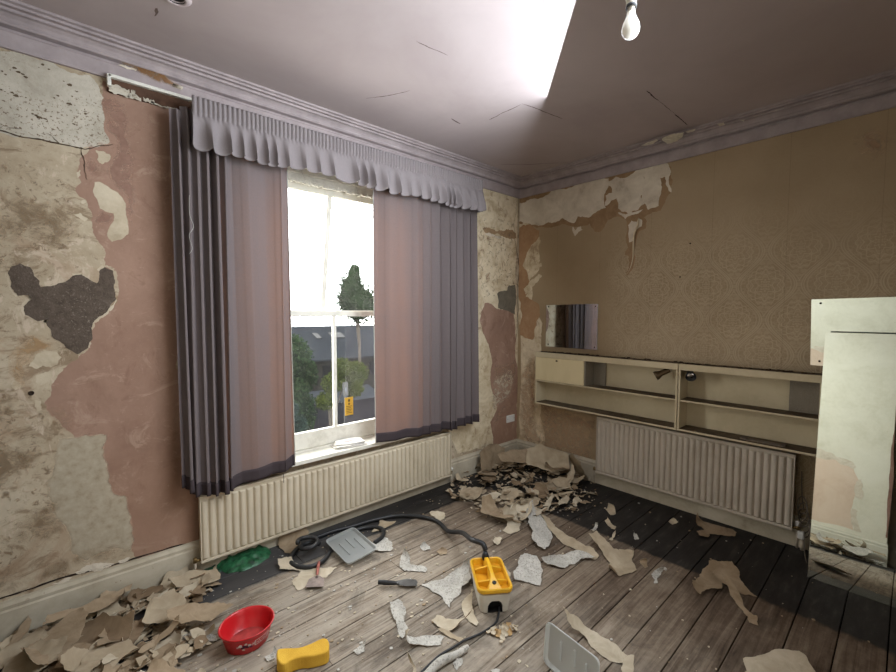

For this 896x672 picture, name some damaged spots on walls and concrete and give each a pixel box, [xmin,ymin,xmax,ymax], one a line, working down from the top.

crack [0,126,113,179]
flaking render [0,51,199,559]
peeling [449,163,673,454]